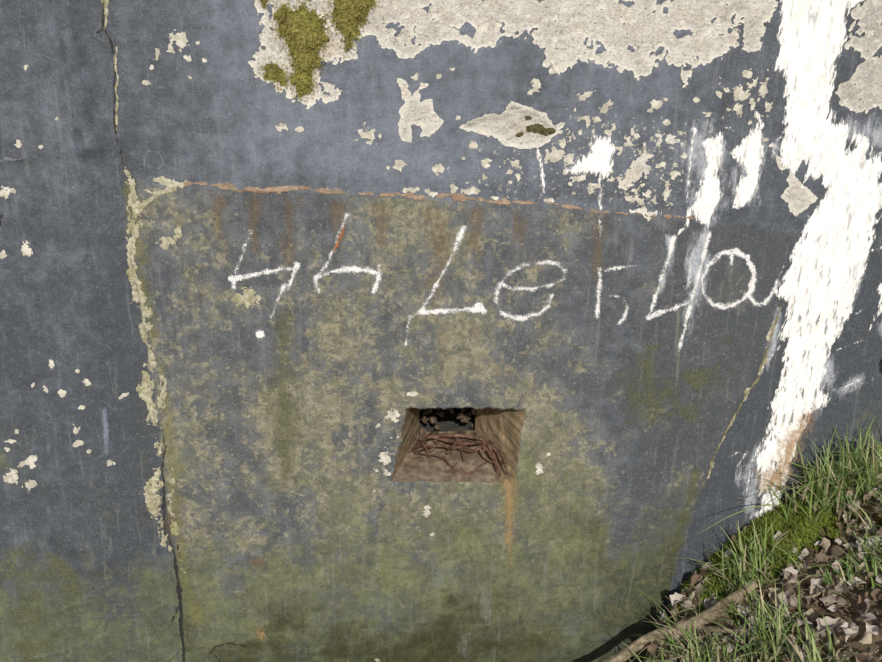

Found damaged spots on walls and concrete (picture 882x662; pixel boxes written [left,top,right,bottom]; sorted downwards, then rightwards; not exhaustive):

peeling [0,186,16,199]
peeling [21,241,33,257]
crack [92,0,125,170]
peeling [397,68,455,143]
rust [183,181,694,220]
peeling [248,0,778,109]
spalling [450,90,688,221]
peeling [716,68,818,216]
peeling [835,0,882,113]
peeling [3,455,37,491]
peeling [73,424,92,454]
crack [702,306,782,488]